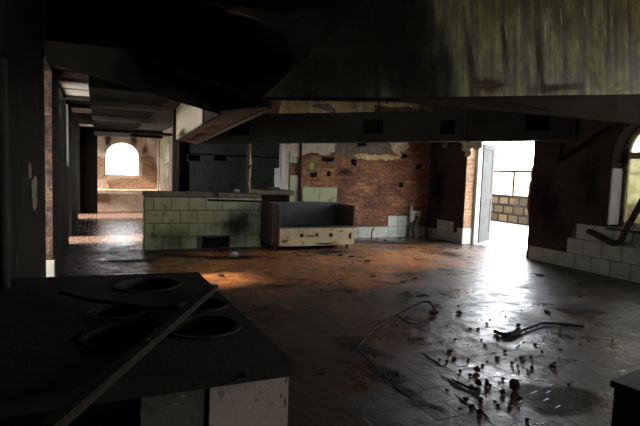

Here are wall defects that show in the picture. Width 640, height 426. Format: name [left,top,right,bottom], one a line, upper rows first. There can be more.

corrosion [467,33,503,95]
corrosion [537,45,578,93]
peeling [28,163,37,210]
peeling [285,142,409,190]